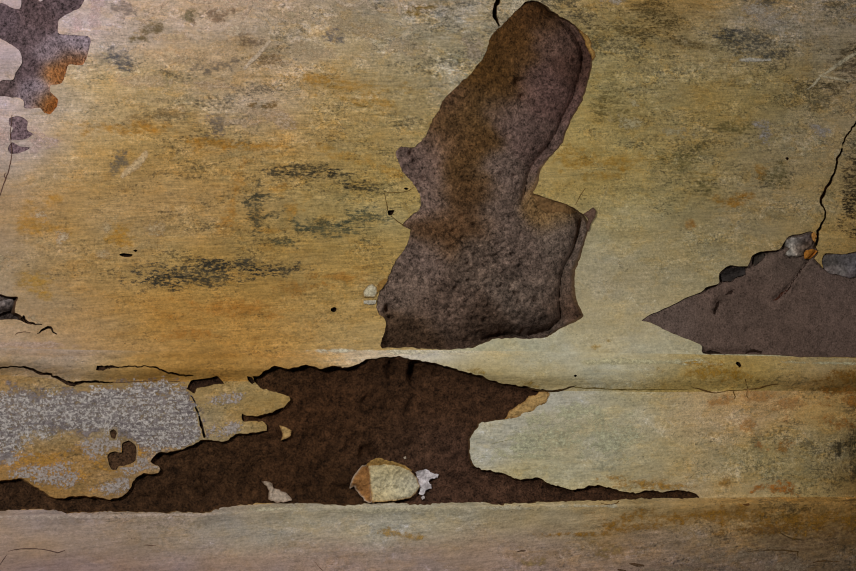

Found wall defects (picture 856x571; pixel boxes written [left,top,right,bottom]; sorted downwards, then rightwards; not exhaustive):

crack [492,0,500,26]
crack [0,116,12,195]
crack [814,121,856,248]
flaking render [0,0,699,514]
crack [15,315,57,335]
flaking render [642,231,856,368]
crack [0,365,206,438]